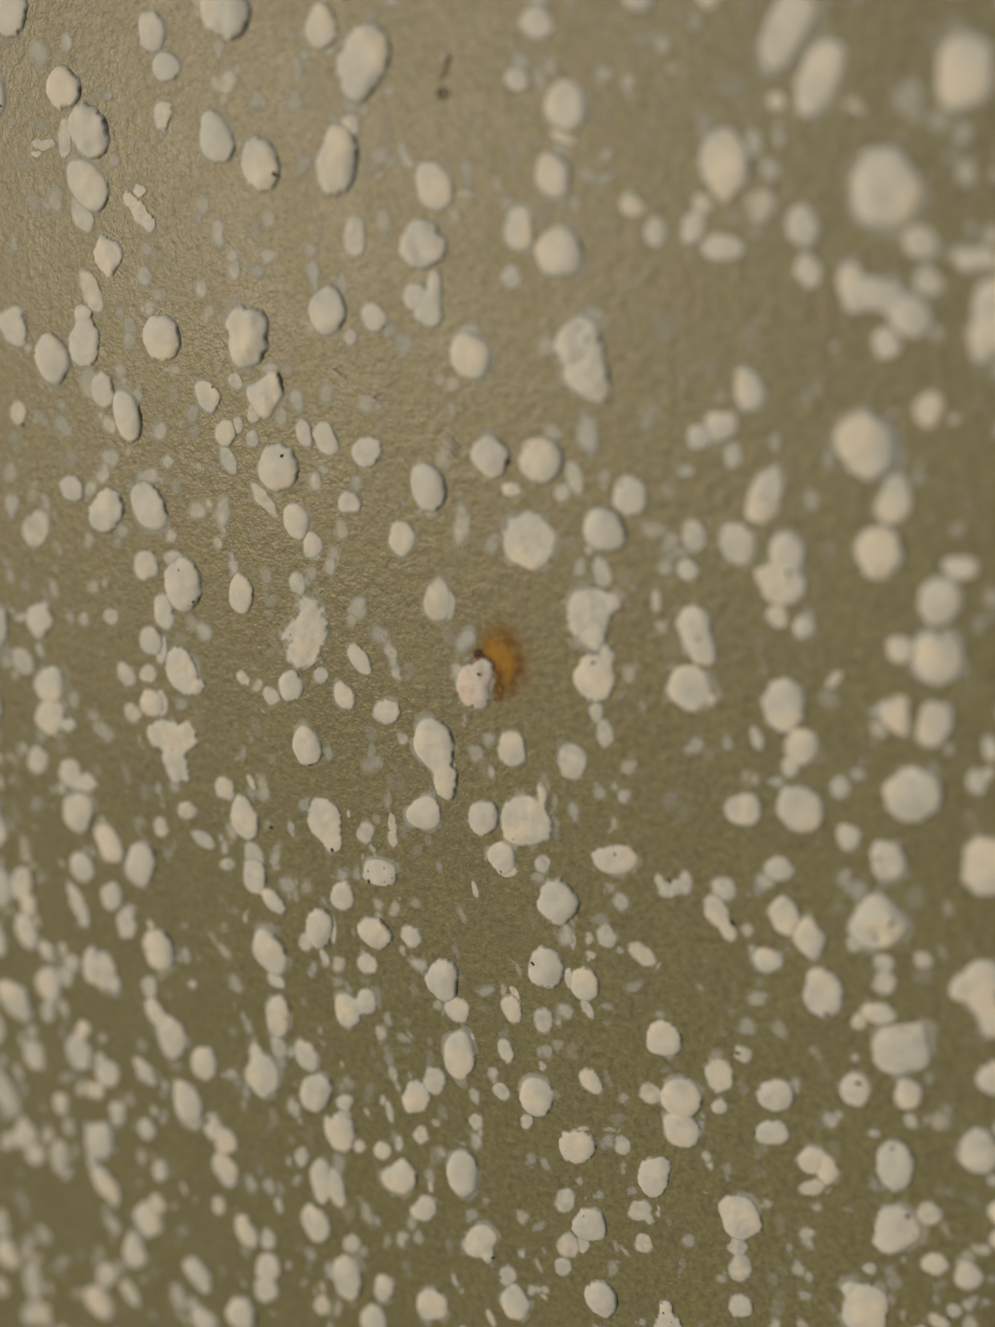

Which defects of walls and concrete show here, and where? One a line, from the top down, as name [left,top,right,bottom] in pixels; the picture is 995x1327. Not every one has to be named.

rust [474,629,520,700]